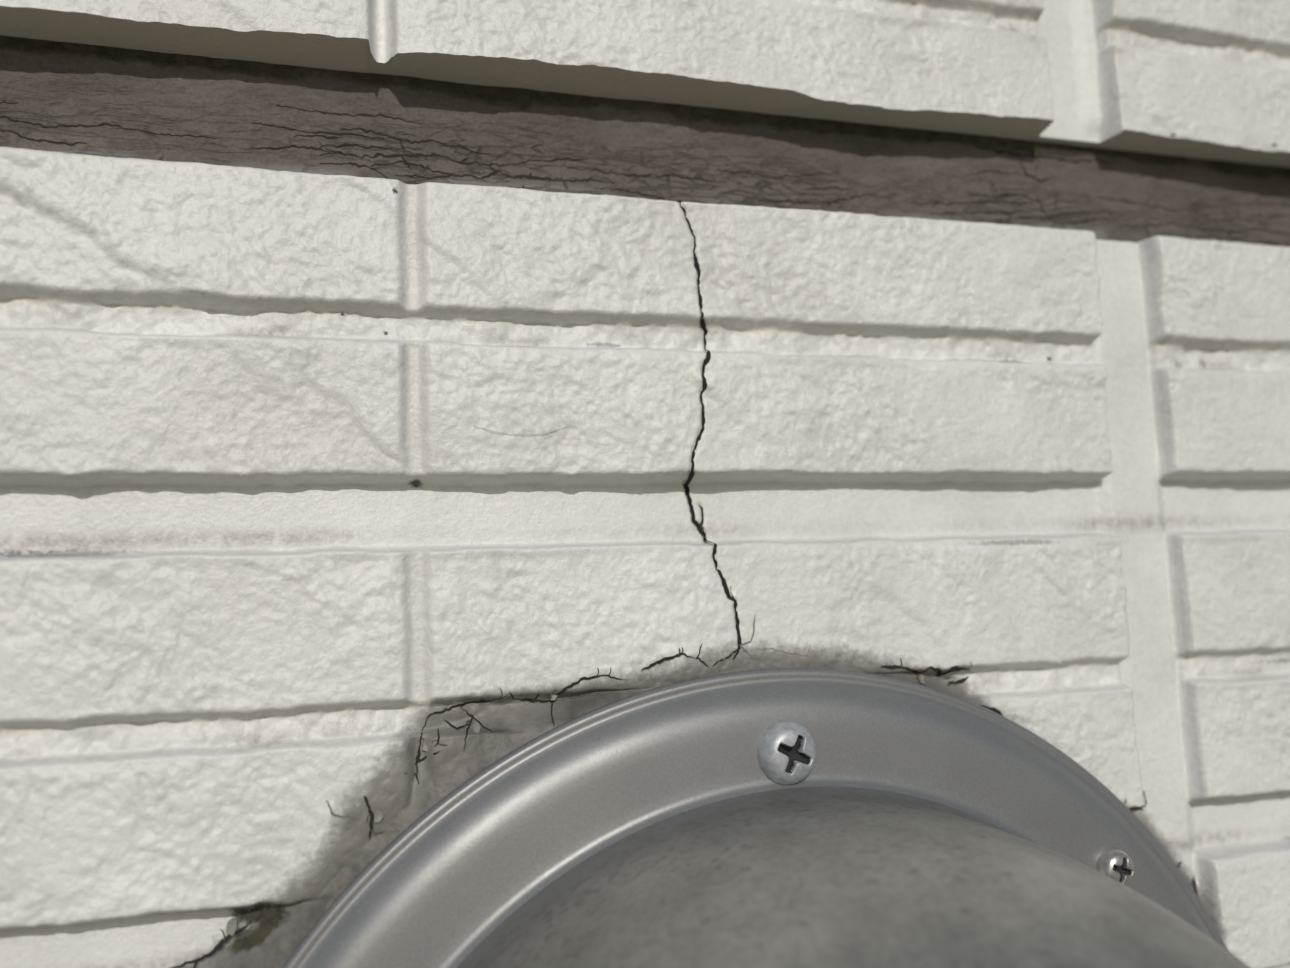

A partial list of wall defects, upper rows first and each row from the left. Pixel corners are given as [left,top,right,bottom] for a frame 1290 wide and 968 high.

crack [0,101,220,145]
crack [251,105,1290,784]
crack [326,796,385,840]
crack [173,918,251,968]